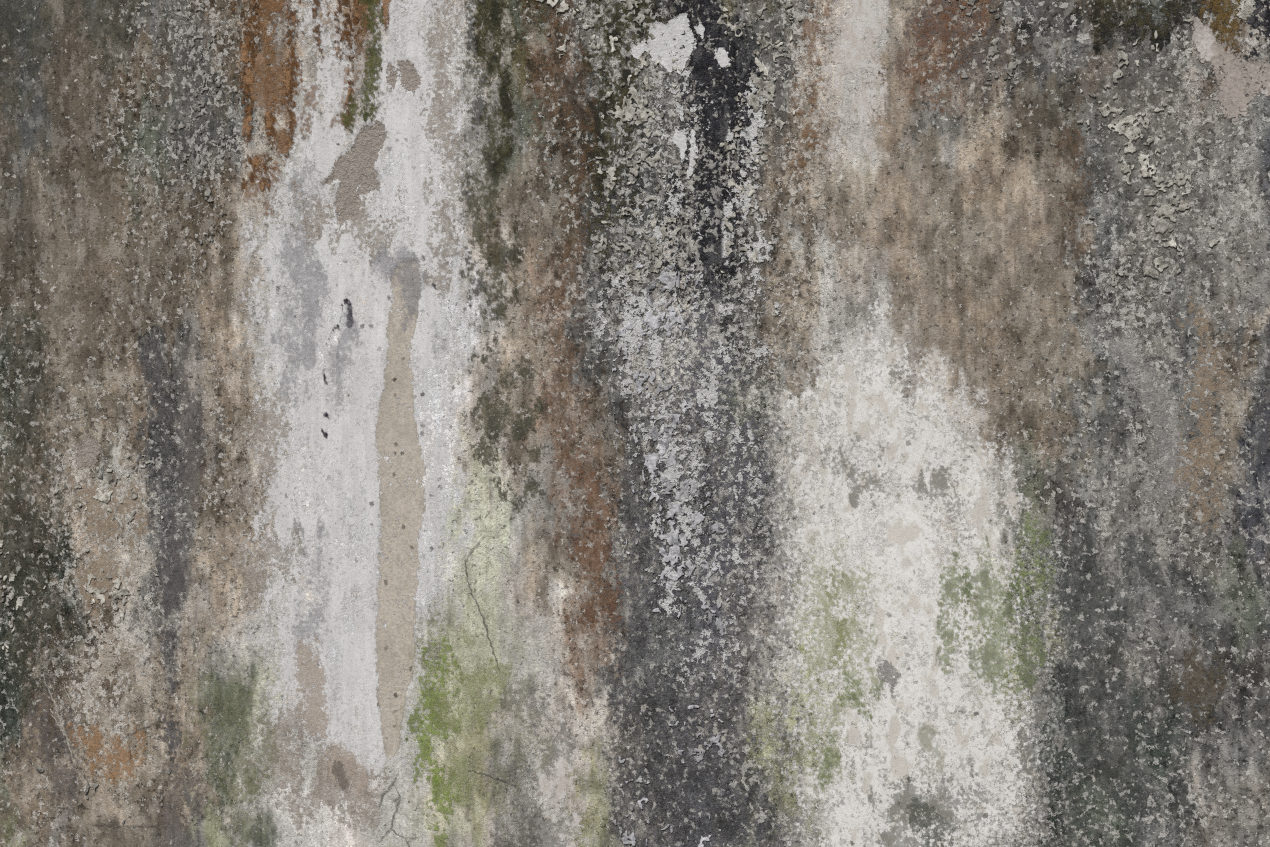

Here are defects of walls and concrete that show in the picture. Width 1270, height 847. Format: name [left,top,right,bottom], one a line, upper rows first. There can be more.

rust [229,0,391,191]
peeling [374,257,426,760]
peeling [516,0,802,644]
water stain [682,331,775,626]
peeling [1077,31,1225,532]